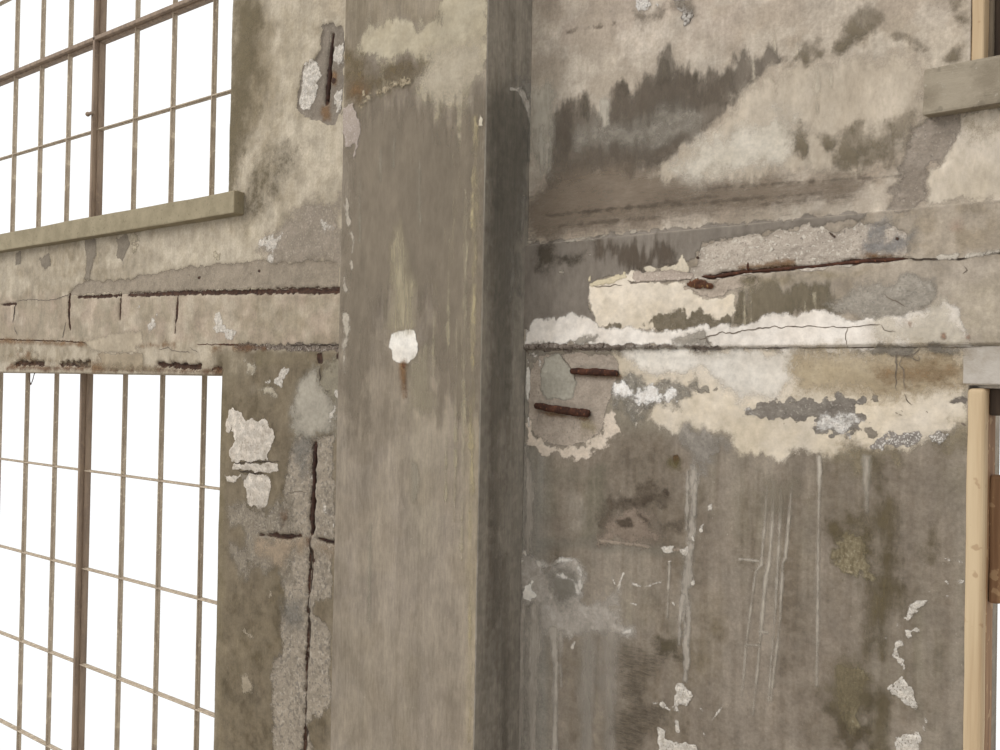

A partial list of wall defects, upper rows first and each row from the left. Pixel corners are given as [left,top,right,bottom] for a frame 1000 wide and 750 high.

flaking render [296,0,488,158]
damp [834,11,880,55]
damp [946,48,961,61]
damp [509,45,903,331]
corrosion [3,286,340,337]
crack [696,324,880,340]
spalling [588,221,1000,330]
flaking render [523,341,968,474]
spalling [226,408,336,750]
peeling [885,600,927,709]
peeling [894,718,927,750]